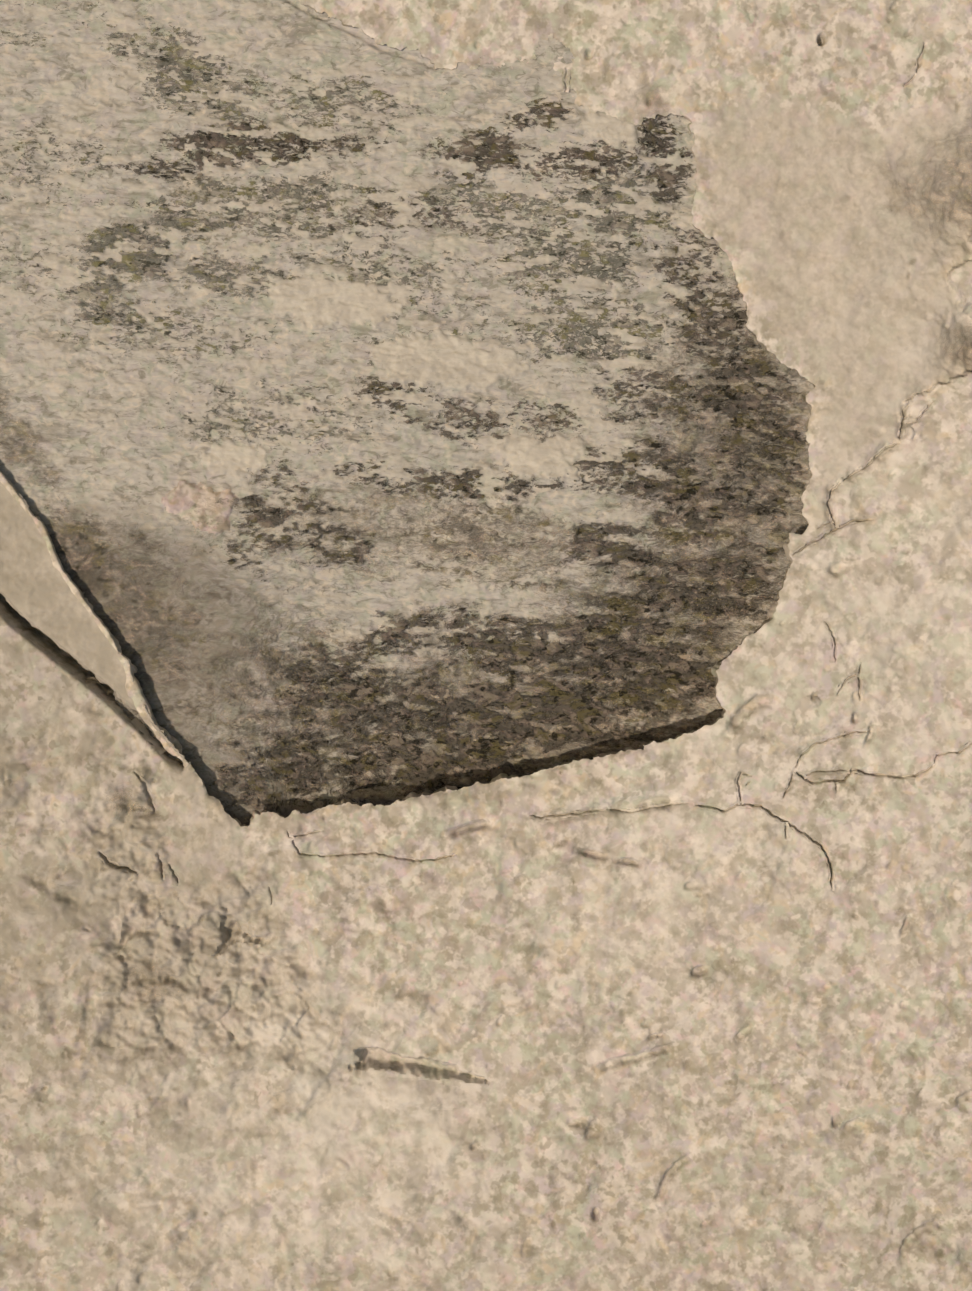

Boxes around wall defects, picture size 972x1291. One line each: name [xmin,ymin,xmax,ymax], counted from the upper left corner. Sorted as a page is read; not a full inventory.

damp [0,0,808,818]
spalling [0,0,972,826]
crack [790,398,936,558]
flaking render [14,860,89,912]
flaking render [54,763,324,1070]
flaking render [444,816,492,840]
flaking render [576,842,643,870]
flaking render [688,961,710,982]
crack [529,619,972,891]
flaking render [591,1033,681,1078]